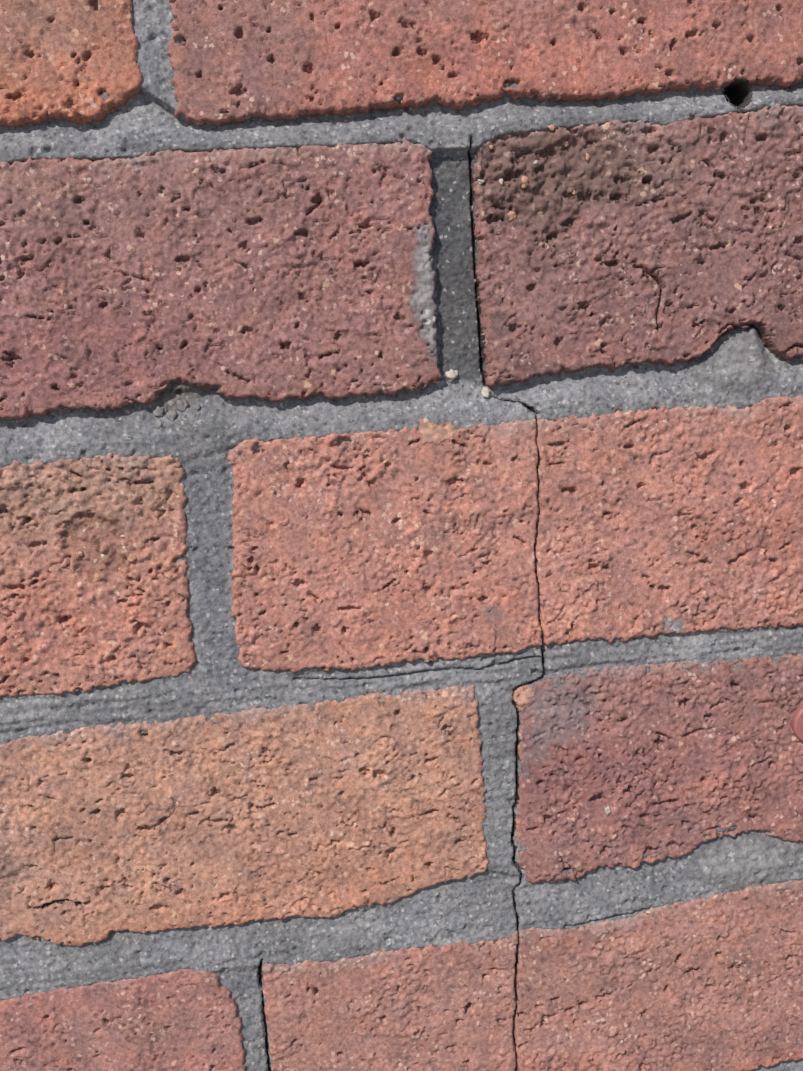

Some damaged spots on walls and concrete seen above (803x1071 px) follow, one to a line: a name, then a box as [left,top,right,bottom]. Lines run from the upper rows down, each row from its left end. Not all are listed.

crack [468,138,537,421]
crack [419,453,544,1071]
crack [258,959,271,1071]